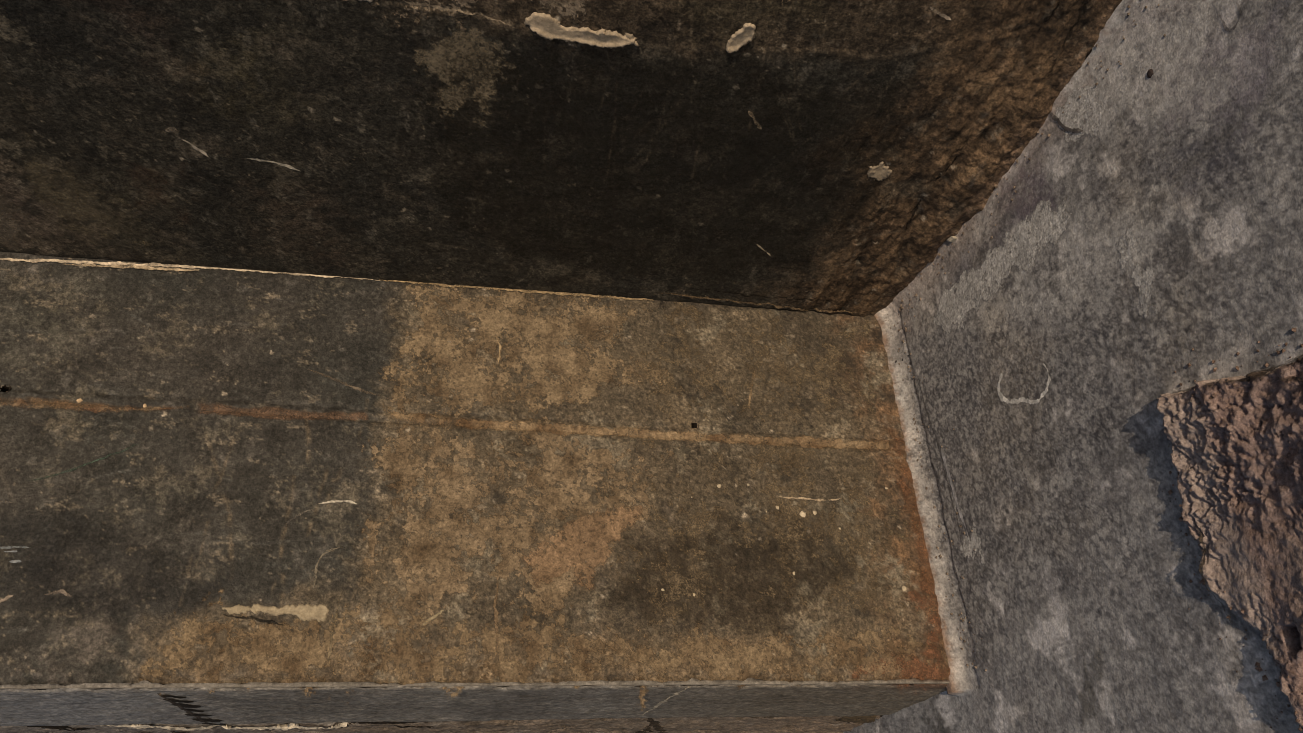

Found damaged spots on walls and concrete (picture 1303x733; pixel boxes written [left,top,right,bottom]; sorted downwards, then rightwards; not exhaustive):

peeling [359,0,514,126]
flaking render [524,0,639,49]
flaking render [726,23,756,53]
crack [1039,3,1093,82]
crack [905,156,957,231]
peeling [139,283,949,711]